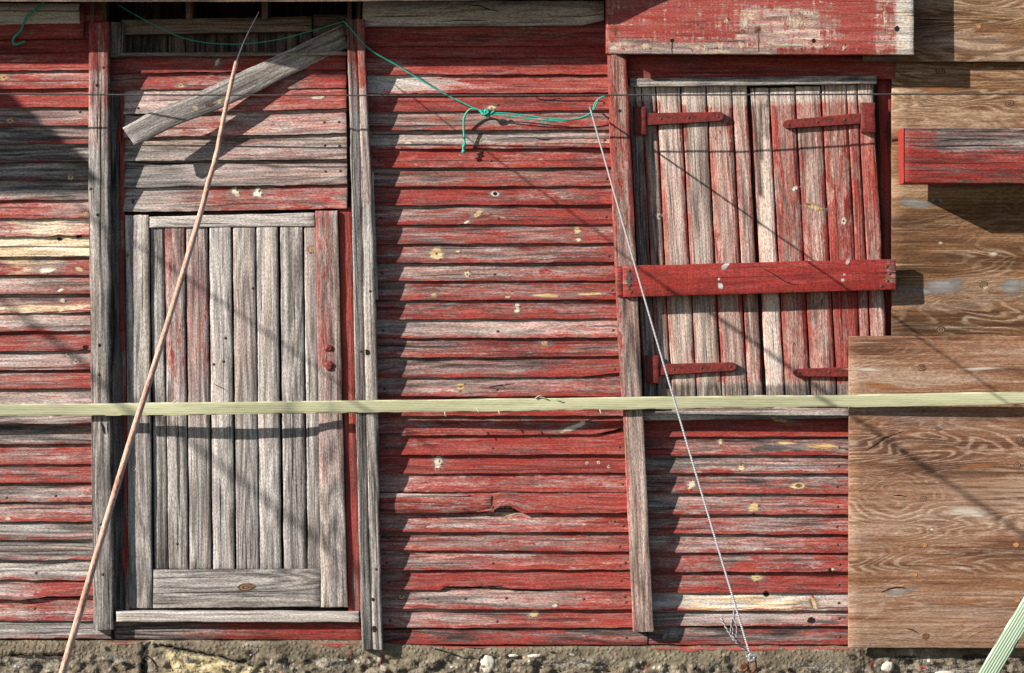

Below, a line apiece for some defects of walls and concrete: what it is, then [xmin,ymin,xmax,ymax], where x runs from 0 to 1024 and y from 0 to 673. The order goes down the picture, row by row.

peeling [689,13,750,51]
peeling [229,187,264,197]
peeling [424,247,463,261]
peeling [35,267,58,275]
peeling [556,421,589,433]
peeling [777,441,843,450]
peeling [434,456,446,471]
crack [483,505,517,513]
peeling [745,501,761,515]